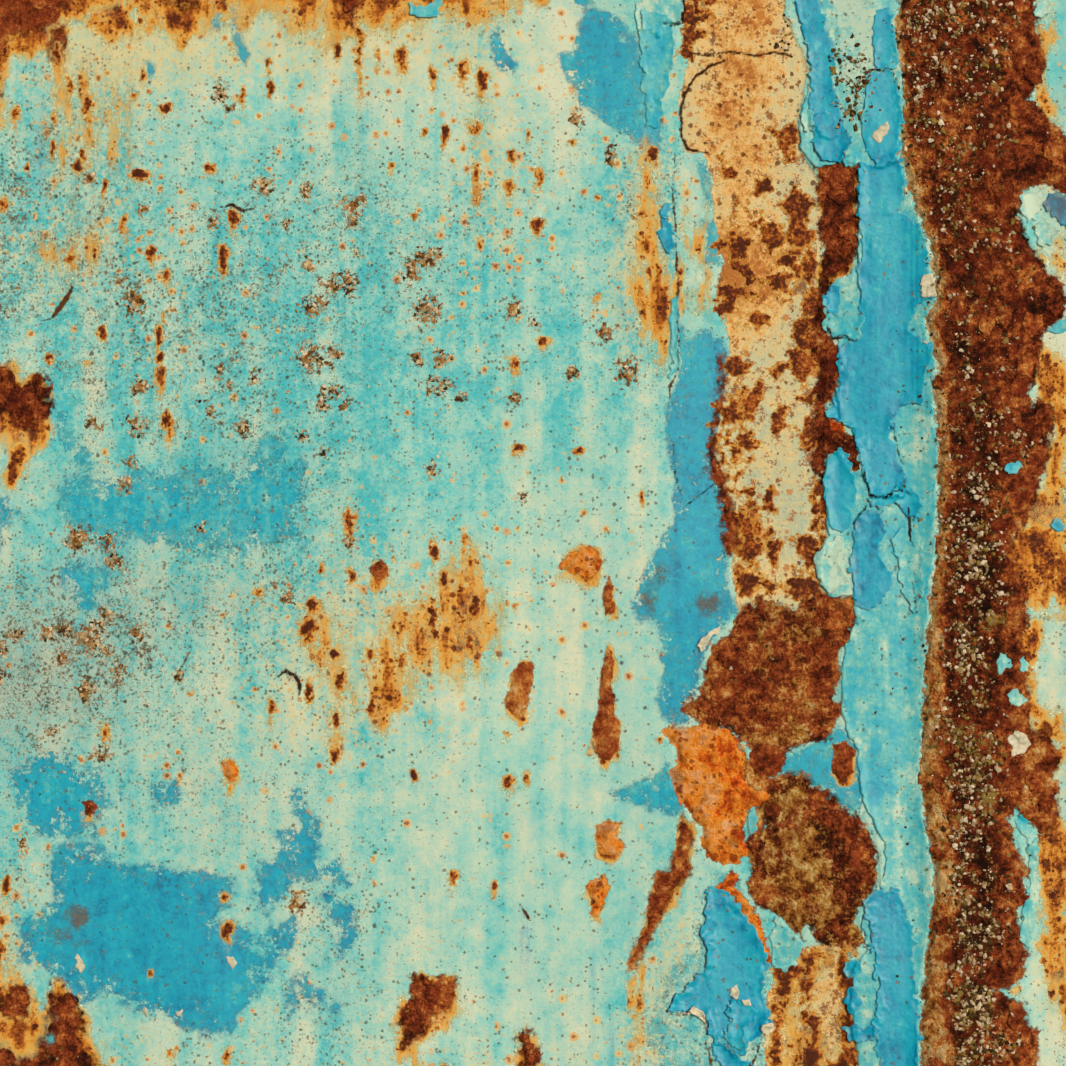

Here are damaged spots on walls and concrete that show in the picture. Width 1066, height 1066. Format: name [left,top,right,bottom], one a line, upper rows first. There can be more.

corrosion [0,0,550,198]
crack [670,0,685,27]
corrosion [0,353,55,491]
corrosion [298,533,519,765]
crack [668,49,793,397]
peeling [559,0,938,1066]
corrosion [808,163,860,484]
corrosion [894,0,1066,1066]
peeling [1019,186,1066,247]
peeling [1047,319,1066,334]
corrosion [655,590,879,963]
corrosion [392,971,461,1066]